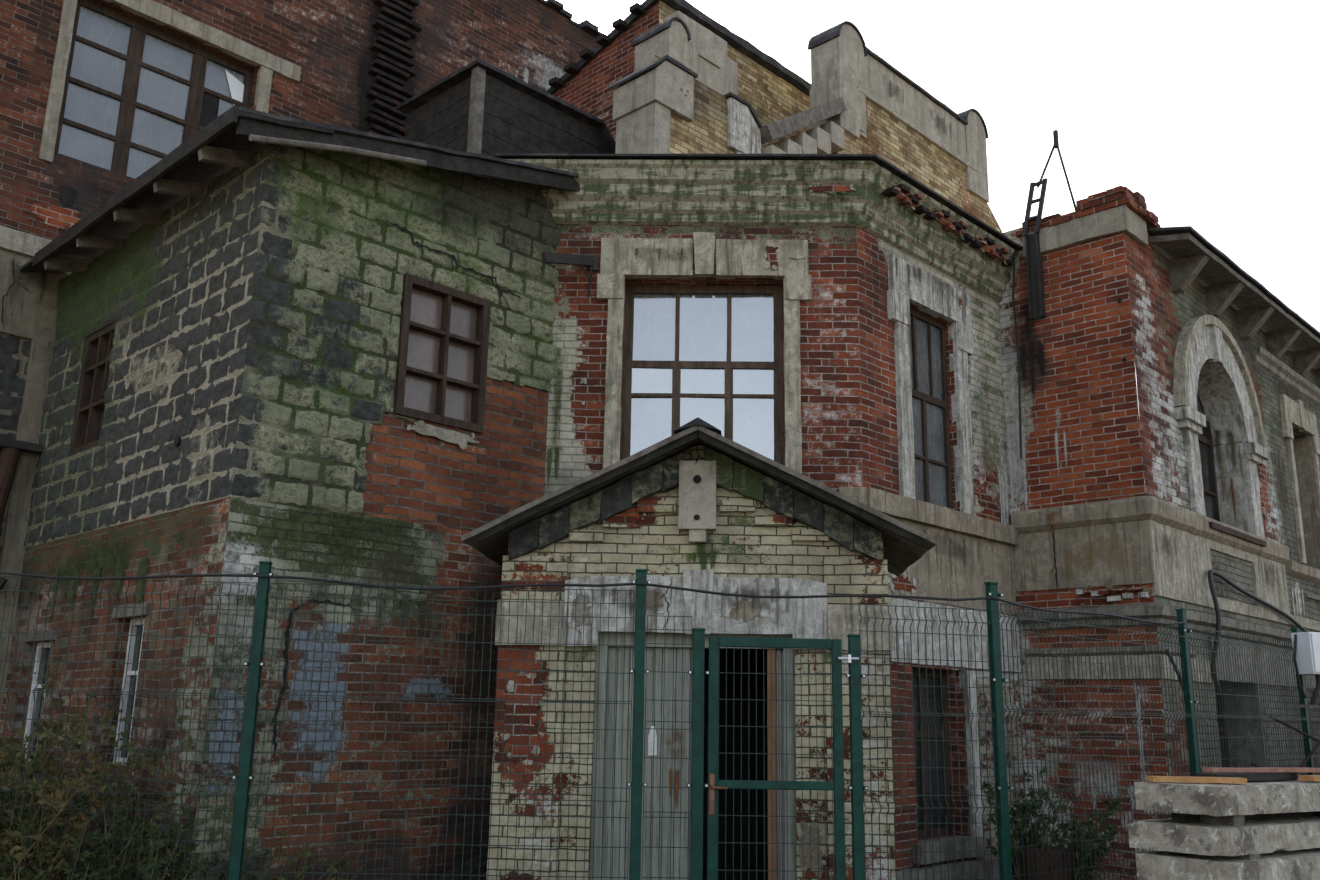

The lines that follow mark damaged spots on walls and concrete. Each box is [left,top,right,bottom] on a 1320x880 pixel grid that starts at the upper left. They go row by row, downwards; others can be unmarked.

peeling [570,351,587,439]
water stain [997,344,1045,524]
crack [271,599,364,760]
peeling [289,618,350,780]
peeling [402,678,451,706]
peeling [500,668,545,765]
spalling [797,814,827,879]